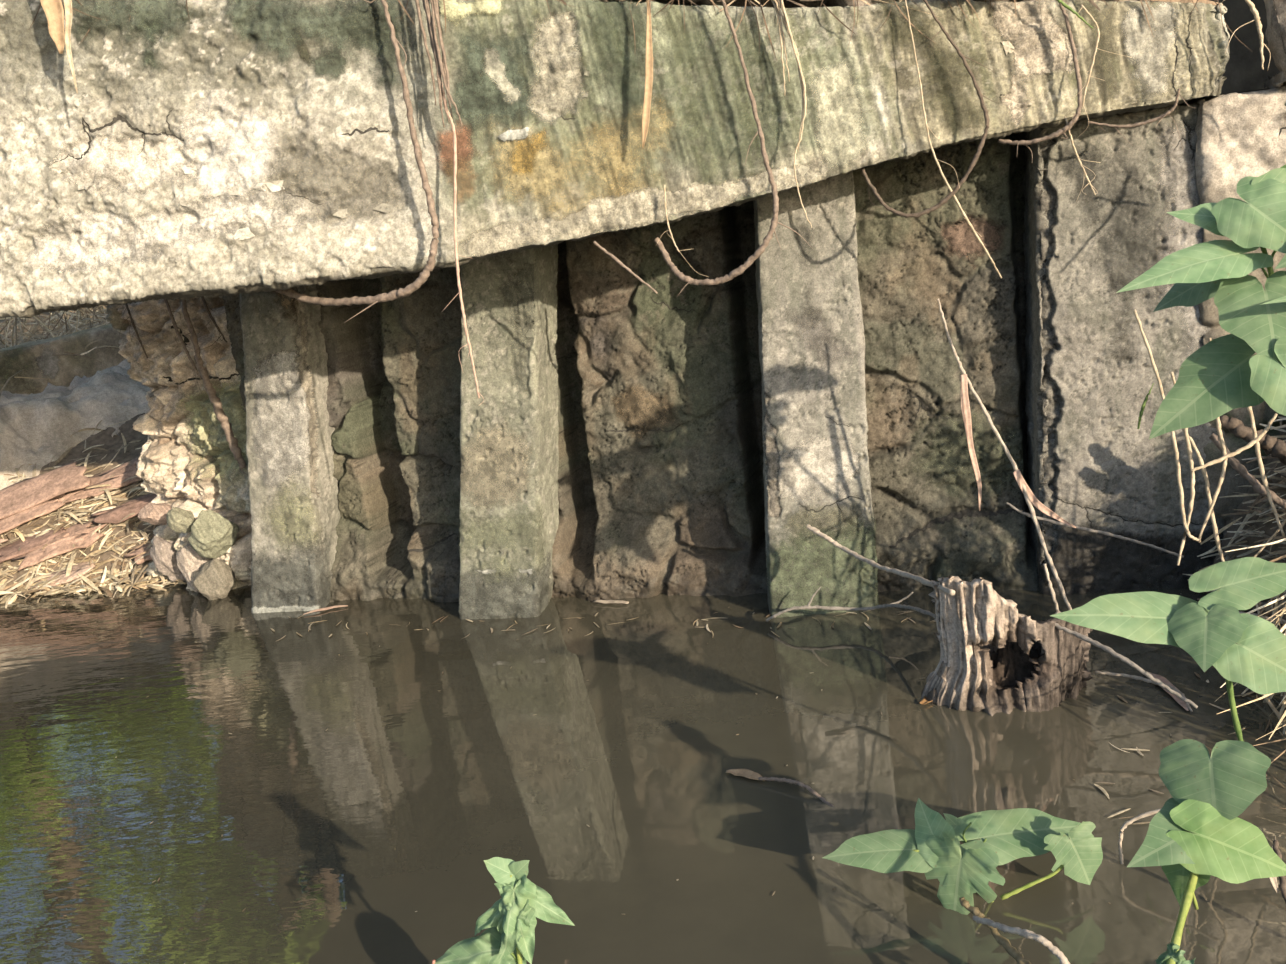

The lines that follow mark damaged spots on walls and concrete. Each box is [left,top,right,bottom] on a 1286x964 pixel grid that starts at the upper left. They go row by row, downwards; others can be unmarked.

crack [54,109,184,163]
water stain [72,0,199,69]
water stain [187,99,280,199]
water stain [225,0,417,87]
water stain [447,31,537,135]
water stain [810,62,867,166]
water stain [884,0,985,129]
water stain [1083,1,1179,98]